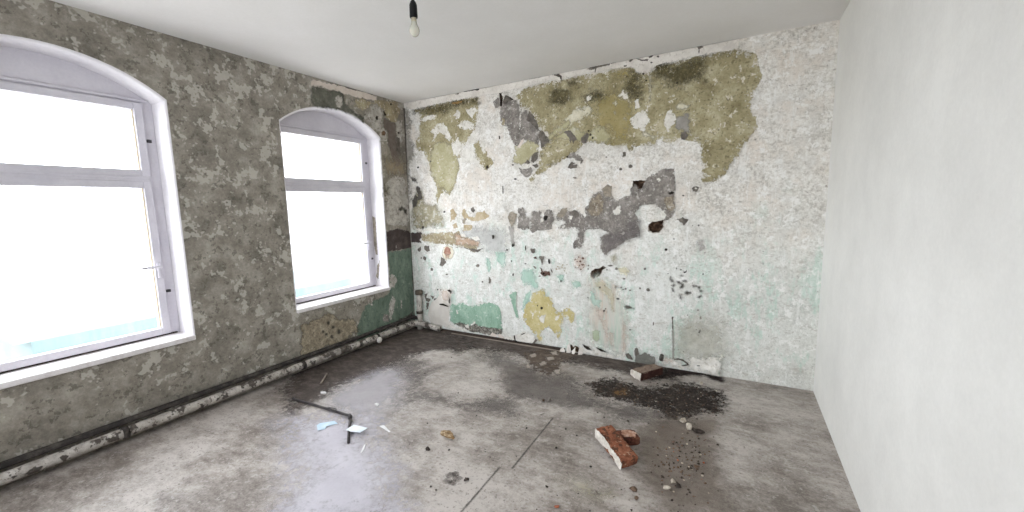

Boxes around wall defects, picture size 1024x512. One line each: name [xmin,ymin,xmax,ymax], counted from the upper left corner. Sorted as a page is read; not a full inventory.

peeling [300,39,763,376]